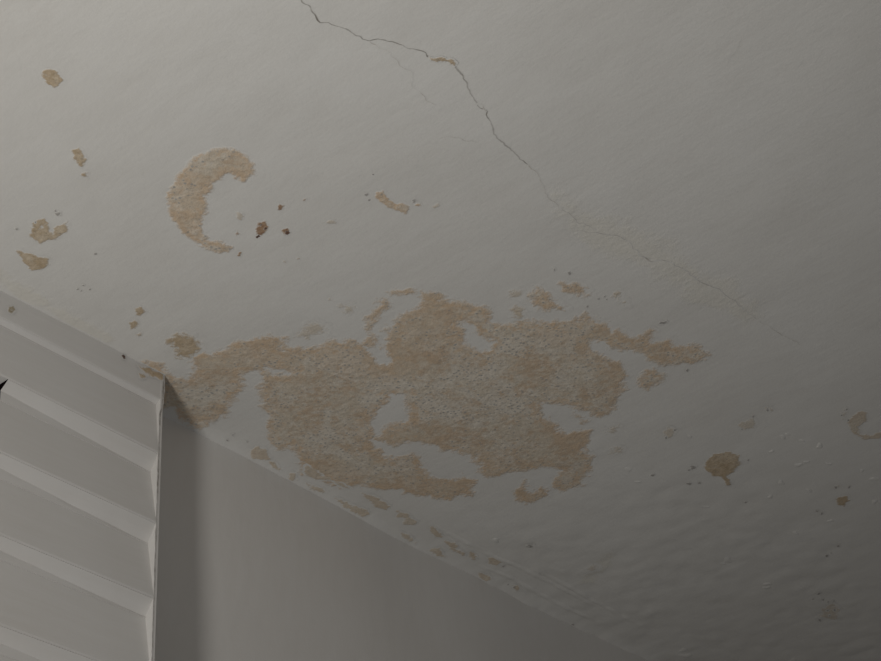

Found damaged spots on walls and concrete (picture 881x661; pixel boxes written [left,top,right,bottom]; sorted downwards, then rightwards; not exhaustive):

peeling [39,67,67,91]
peeling [161,143,259,255]
peeling [363,189,443,216]
crack [300,0,802,346]
peeling [14,209,72,273]
peeling [137,267,716,507]
peeling [685,451,750,487]